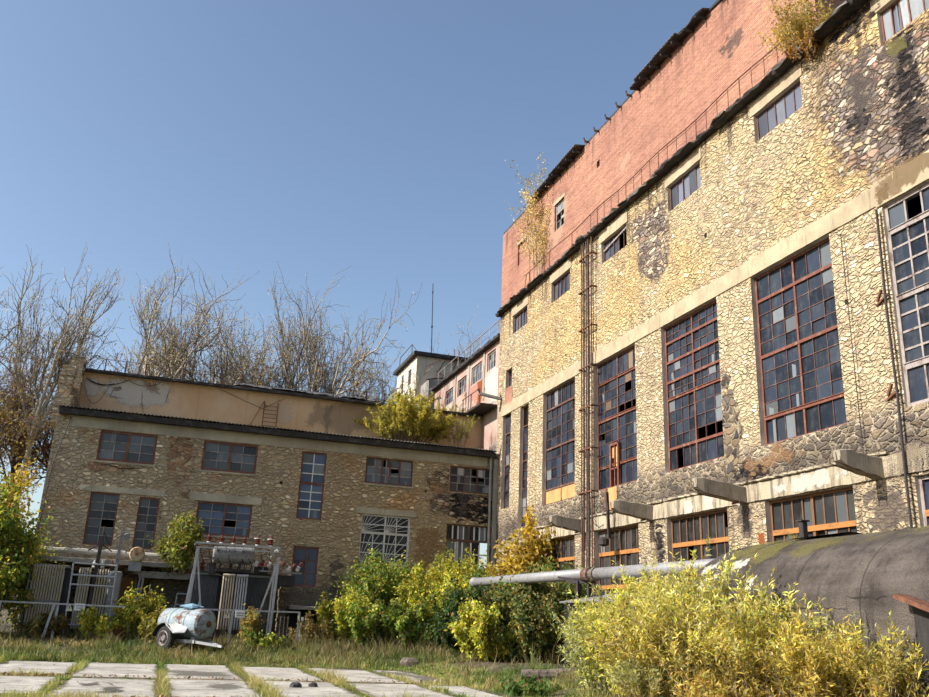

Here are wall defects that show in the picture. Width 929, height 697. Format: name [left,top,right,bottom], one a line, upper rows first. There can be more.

water stain [719,28,742,60]
water stain [828,0,929,204]
spalling [630,200,670,282]
flaking render [84,378,173,409]
spalling [424,468,492,520]